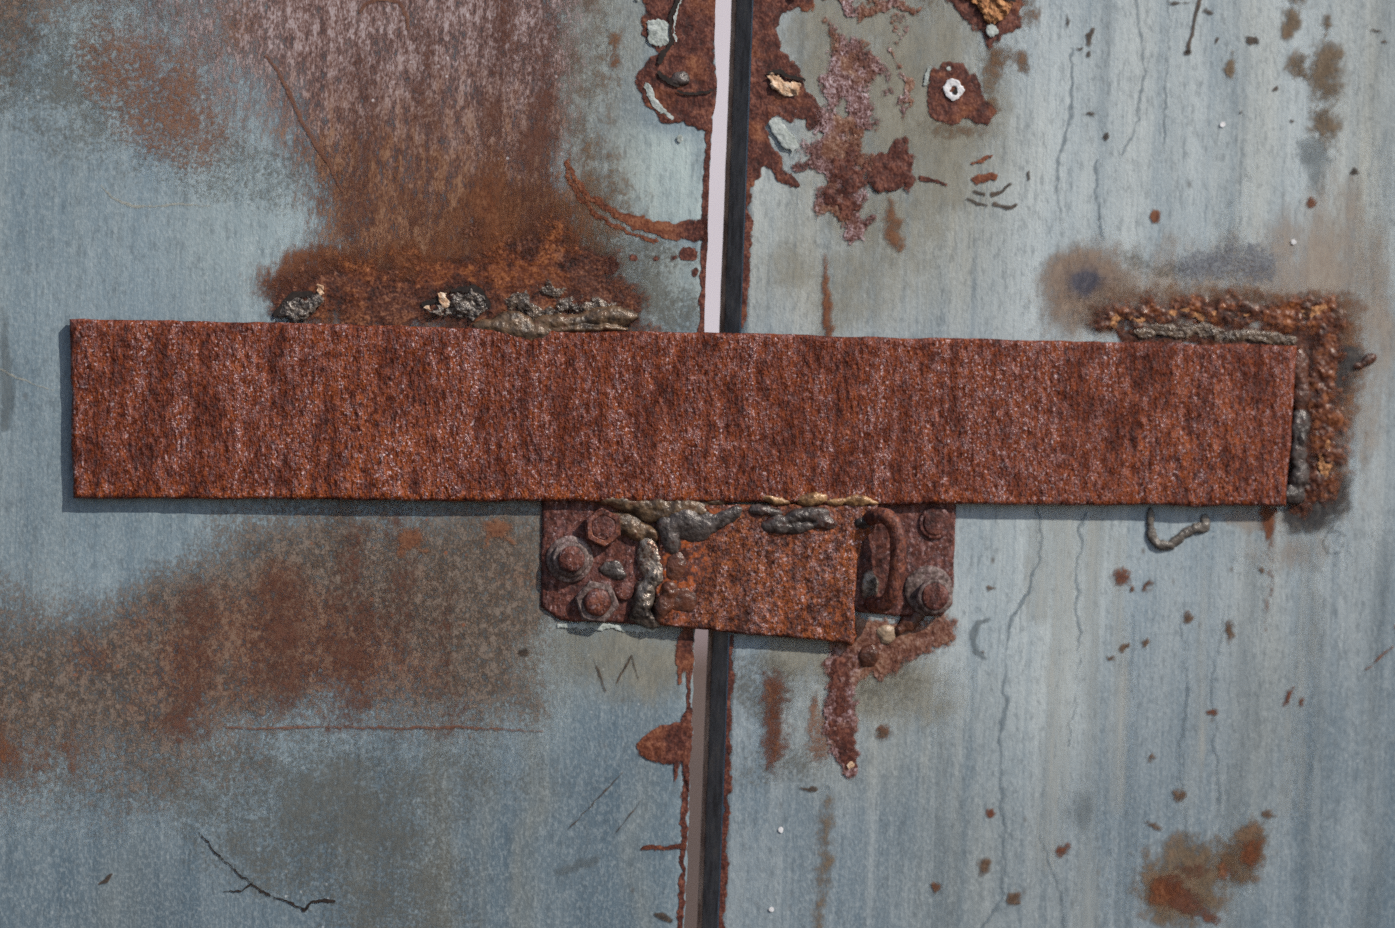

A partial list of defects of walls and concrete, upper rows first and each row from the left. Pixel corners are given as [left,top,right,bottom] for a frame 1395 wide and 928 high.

rust [0,0,712,332]
rust [792,0,1003,252]
rust [822,257,835,336]
rust [0,499,556,812]
rust [675,628,695,710]
rust [803,614,958,779]
crack [199,833,336,912]
rust [641,778,690,928]
rust [719,635,793,928]
rust [1139,810,1278,928]